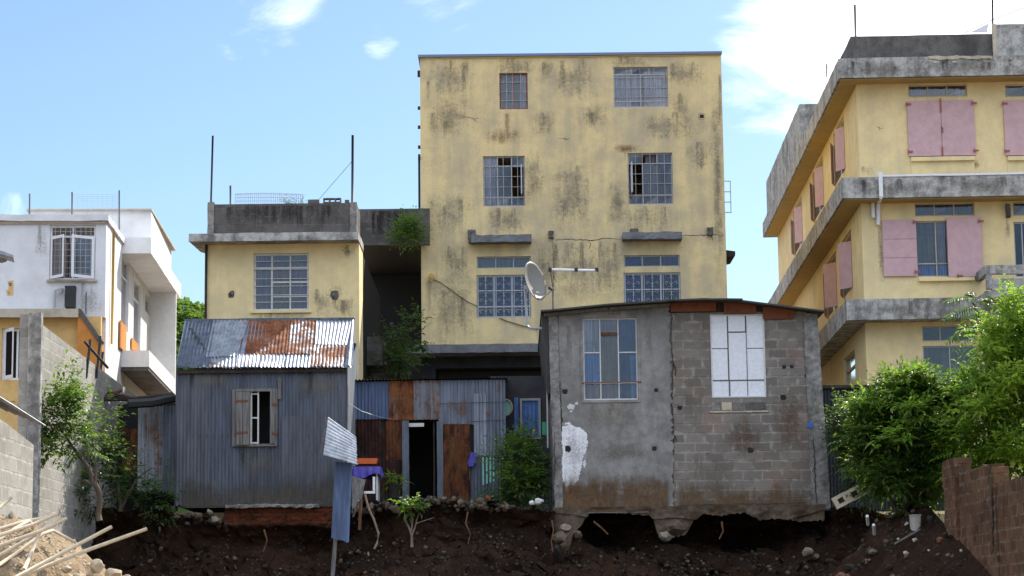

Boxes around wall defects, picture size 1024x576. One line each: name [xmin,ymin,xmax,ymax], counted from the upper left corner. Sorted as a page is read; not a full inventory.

water stain [246,206,330,220]
peeling [561,387,588,485]
crack [670,314,818,519]